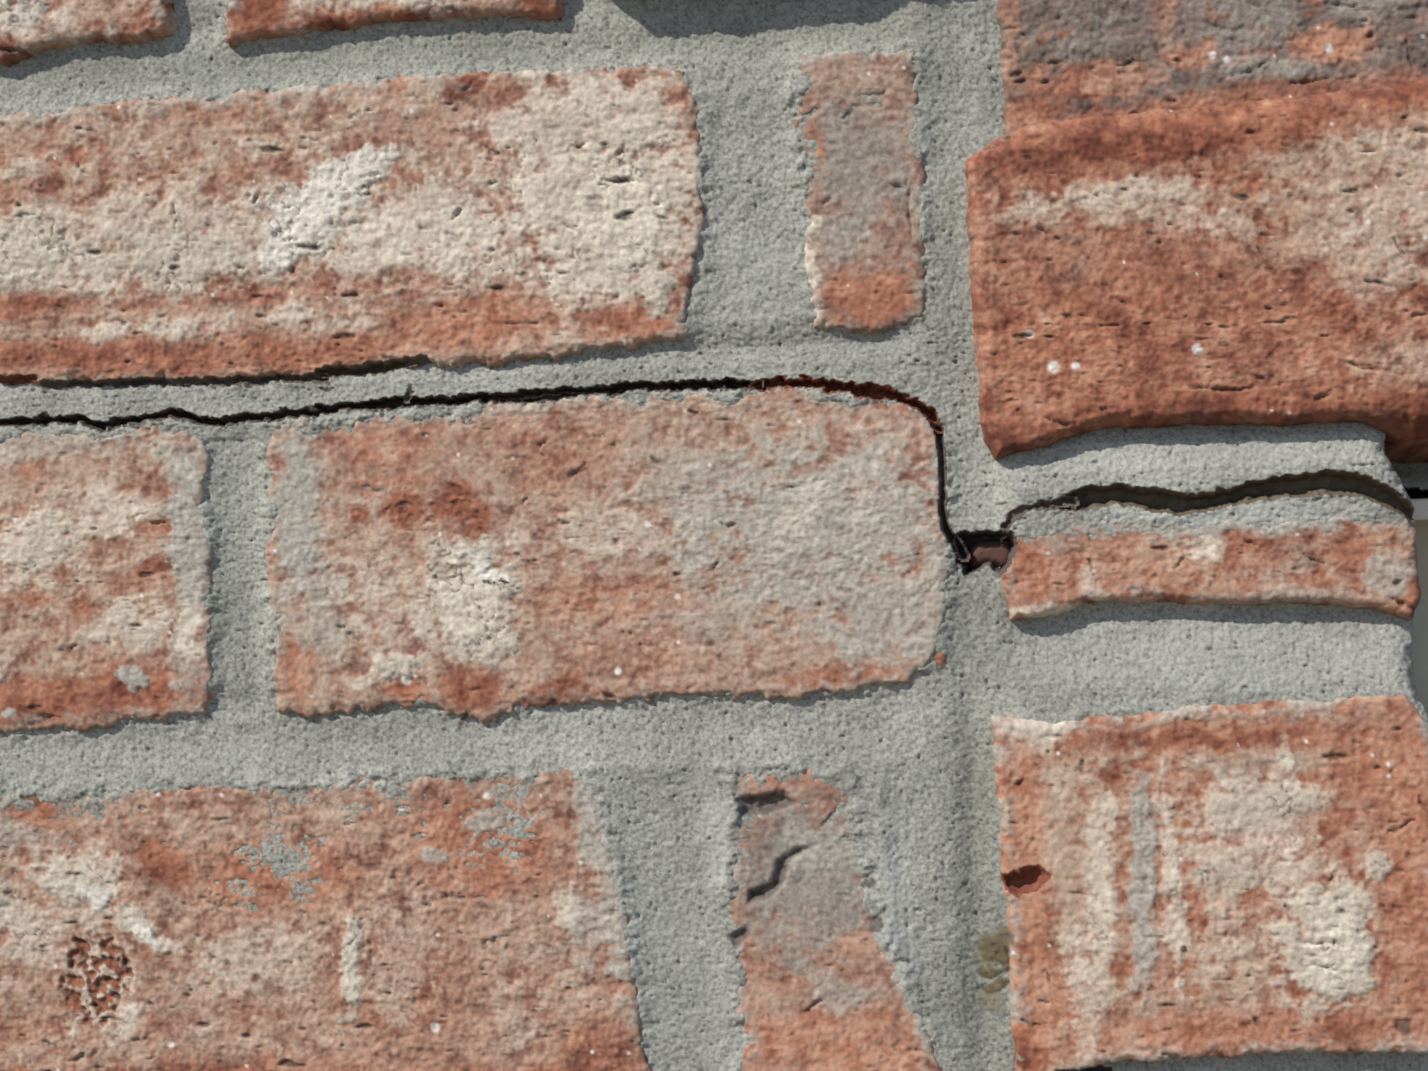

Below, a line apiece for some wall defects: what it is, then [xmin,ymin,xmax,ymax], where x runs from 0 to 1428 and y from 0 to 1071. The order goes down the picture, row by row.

crack [0,354,971,562]
crack [1000,468,1428,532]
spalling [41,865,162,1029]
spalling [1001,864,1051,897]